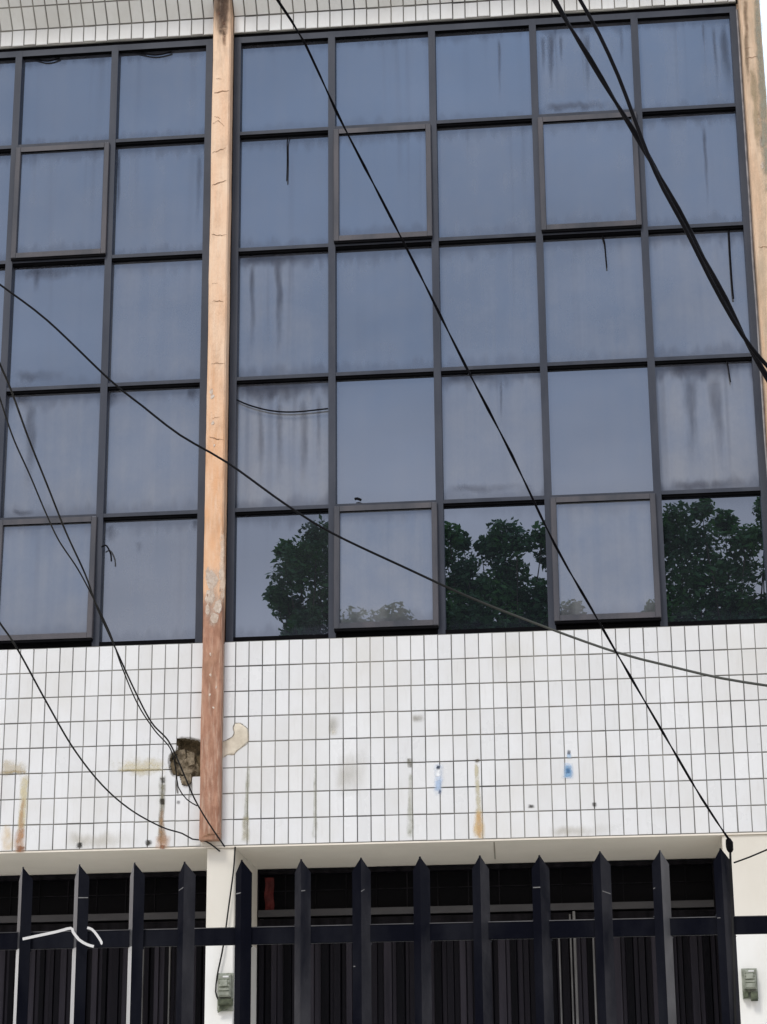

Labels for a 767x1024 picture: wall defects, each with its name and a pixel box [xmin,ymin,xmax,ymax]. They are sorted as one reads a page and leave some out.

peeling [205,541,224,624]
rust [16,777,28,852]
spalling [169,738,200,786]
peeling [222,723,249,758]
rust [474,759,482,836]